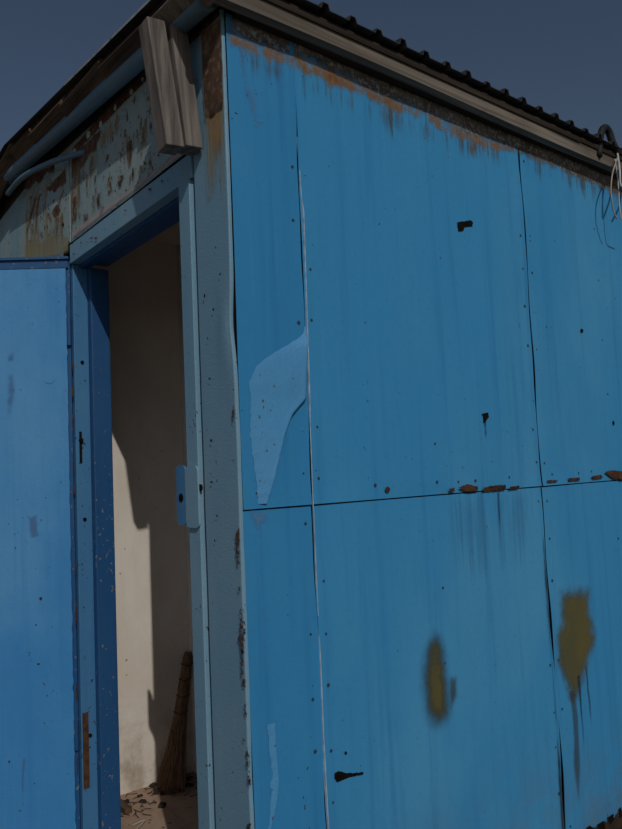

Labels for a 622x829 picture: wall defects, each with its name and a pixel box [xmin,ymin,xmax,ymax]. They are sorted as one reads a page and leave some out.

rust [24,71,155,257]
rust [201,19,418,195]
rust [430,116,509,153]
peeling [238,609,246,688]
water stain [428,644,455,719]
water stain [559,592,595,714]